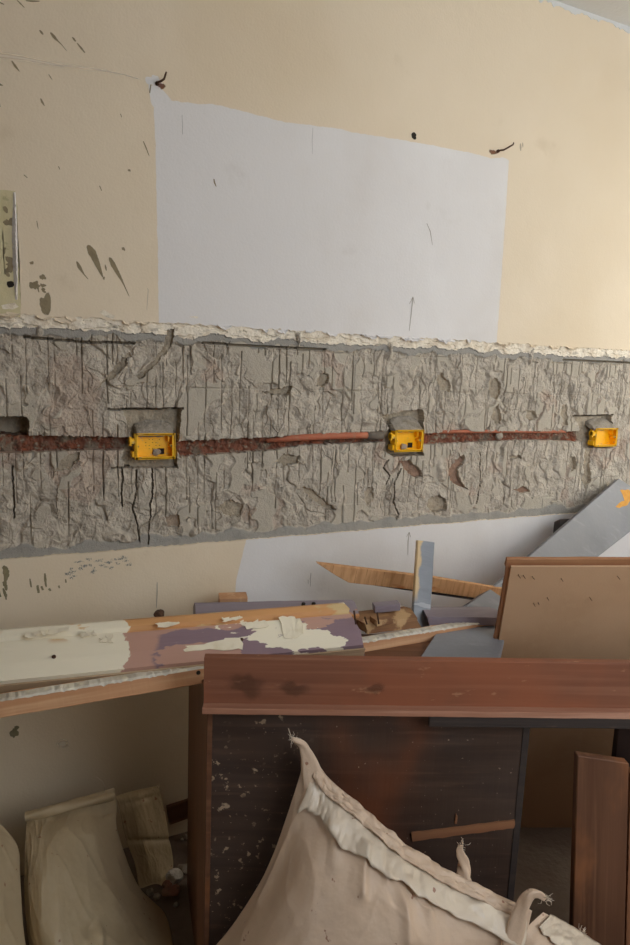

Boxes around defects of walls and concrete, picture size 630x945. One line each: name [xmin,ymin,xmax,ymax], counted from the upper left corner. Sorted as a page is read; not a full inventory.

spalling [0,192,630,559]